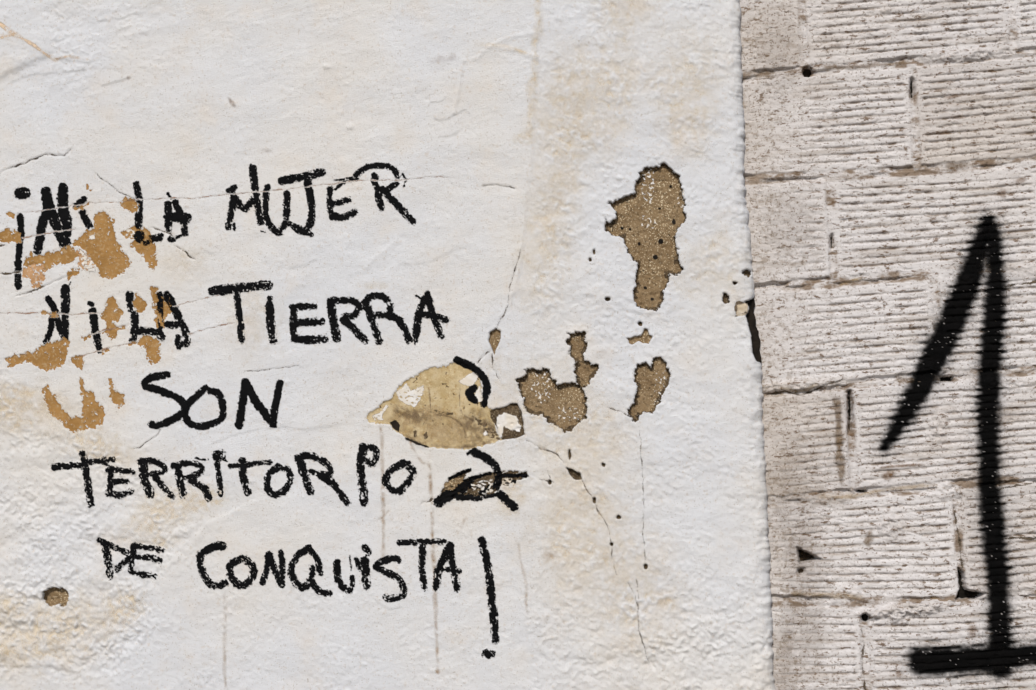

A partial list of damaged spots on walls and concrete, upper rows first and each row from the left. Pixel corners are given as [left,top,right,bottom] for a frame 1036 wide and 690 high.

peeling [0,184,158,289]
spalling [605,163,686,311]
crack [2,271,43,314]
peeling [5,286,172,433]
crack [64,312,135,357]
spalling [367,329,599,450]
spalling [627,322,652,345]
spalling [628,357,671,422]